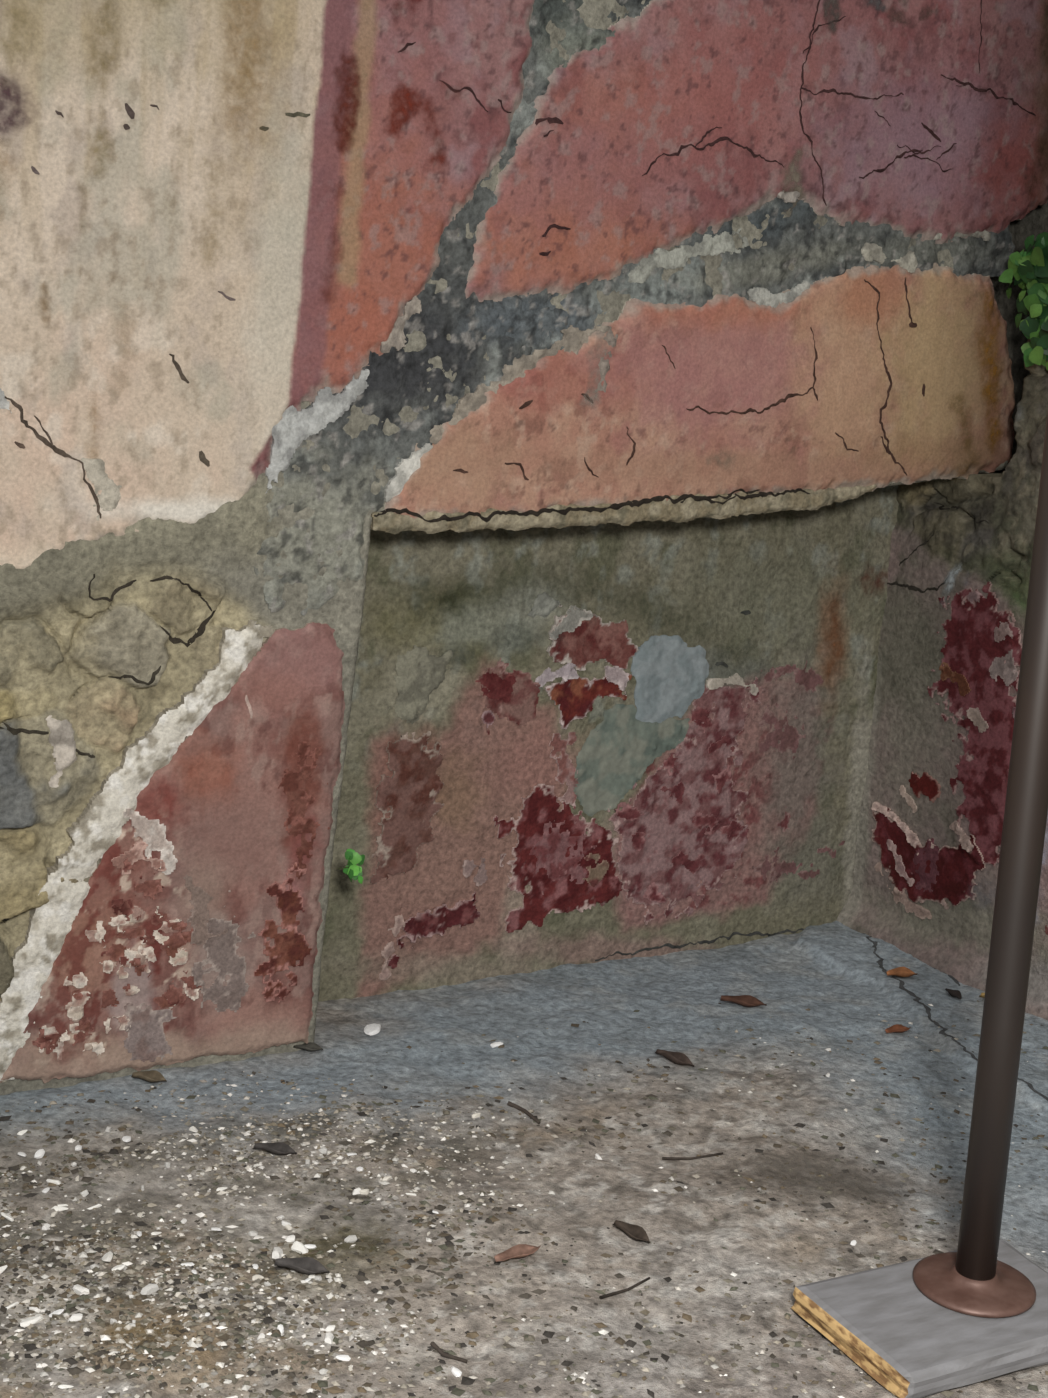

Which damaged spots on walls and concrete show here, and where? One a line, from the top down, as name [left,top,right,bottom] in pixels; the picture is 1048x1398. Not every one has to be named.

spalling [522,0,651,104]
crack [941,0,1036,116]
crack [254,0,1015,616]
crack [0,388,122,521]
spalling [0,619,330,1083]
peeling [369,604,845,980]
peeling [871,582,1022,920]
crack [863,933,978,1061]
crack [1018,1078,1048,1101]